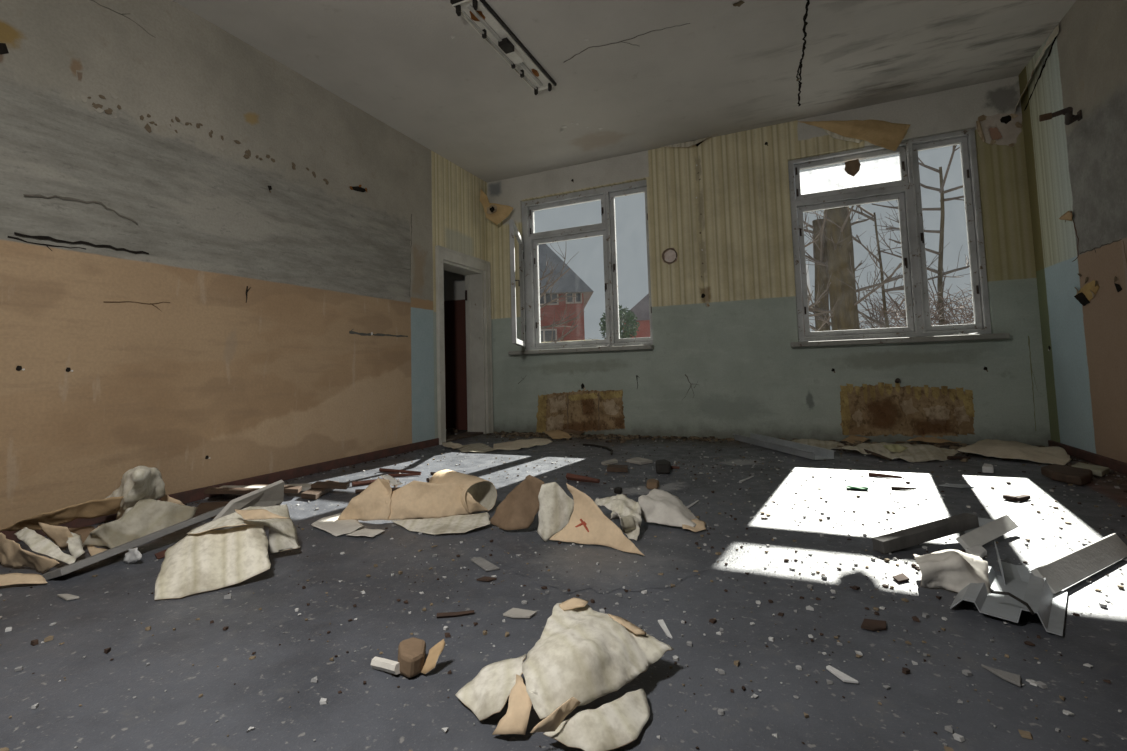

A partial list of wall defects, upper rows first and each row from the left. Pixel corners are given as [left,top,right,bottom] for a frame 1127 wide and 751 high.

rust [0,16,37,66]
crack [565,23,690,62]
peeling [140,114,275,162]
peeling [976,113,1023,147]
crack [7,236,86,251]
crack [103,301,170,311]
crack [349,329,408,337]